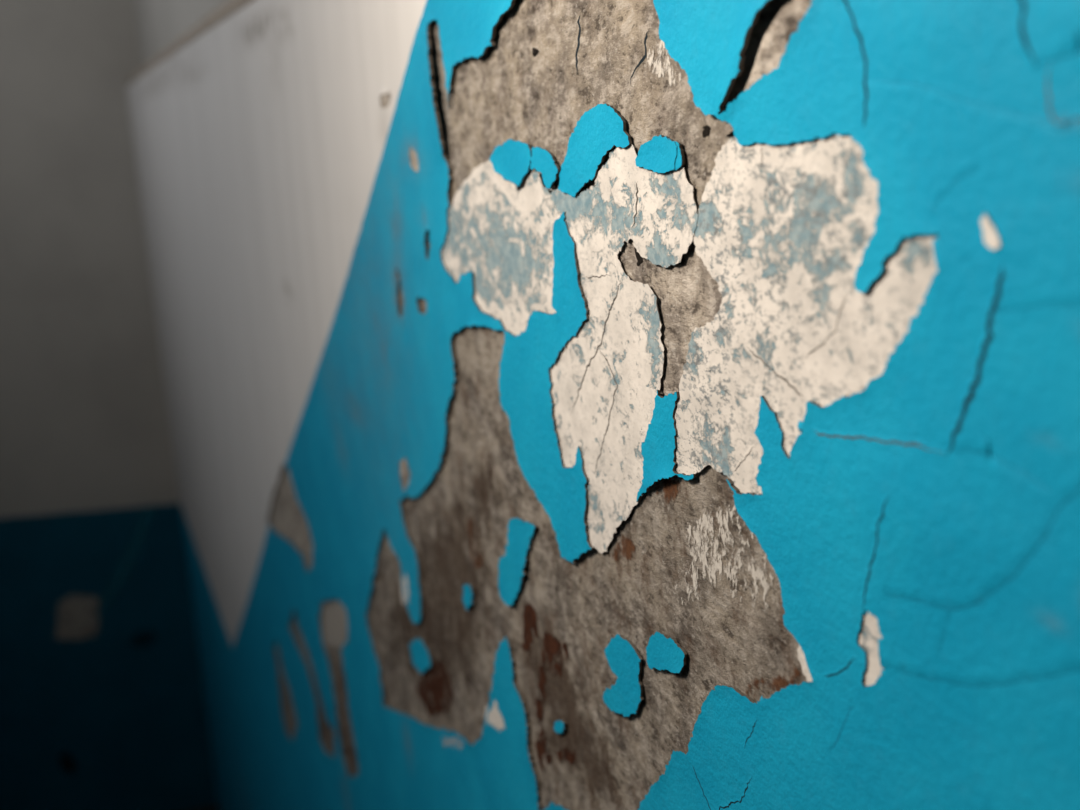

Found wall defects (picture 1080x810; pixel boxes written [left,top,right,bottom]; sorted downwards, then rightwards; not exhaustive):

crack [840,0,868,129]
crack [926,154,1080,459]
spalling [368,0,938,810]
peeling [269,464,313,568]
crack [861,491,890,615]
peeling [275,641,298,738]
peeling [290,599,359,776]
crack [743,696,763,749]
crack [823,608,1080,755]